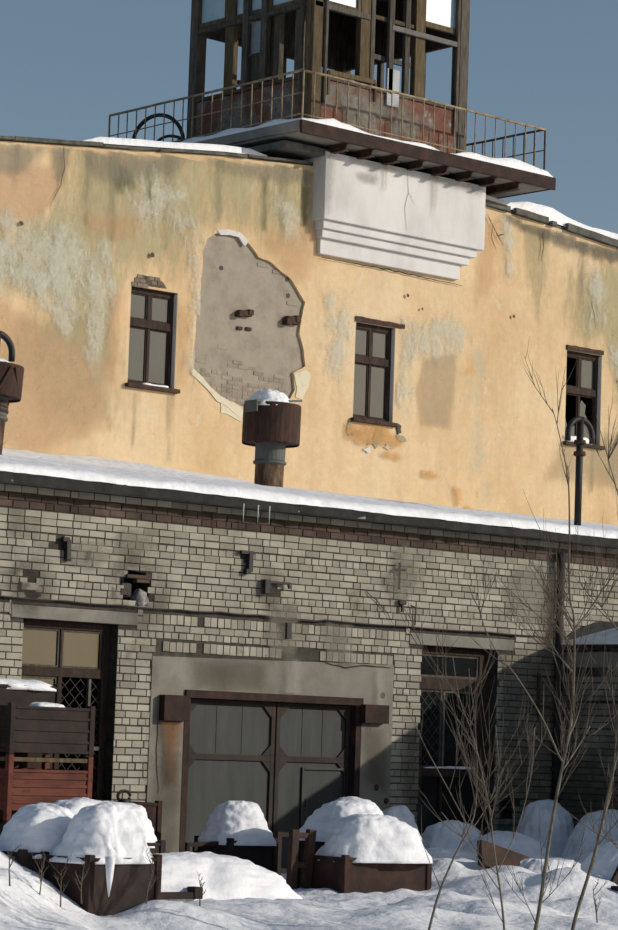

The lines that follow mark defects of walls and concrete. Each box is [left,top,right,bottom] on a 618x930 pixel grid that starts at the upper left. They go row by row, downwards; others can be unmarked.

water stain [0,212,115,360]
spalling [131,274,167,289]
flaking render [191,229,311,422]
peeling [363,424,407,453]
spalling [120,572,152,606]